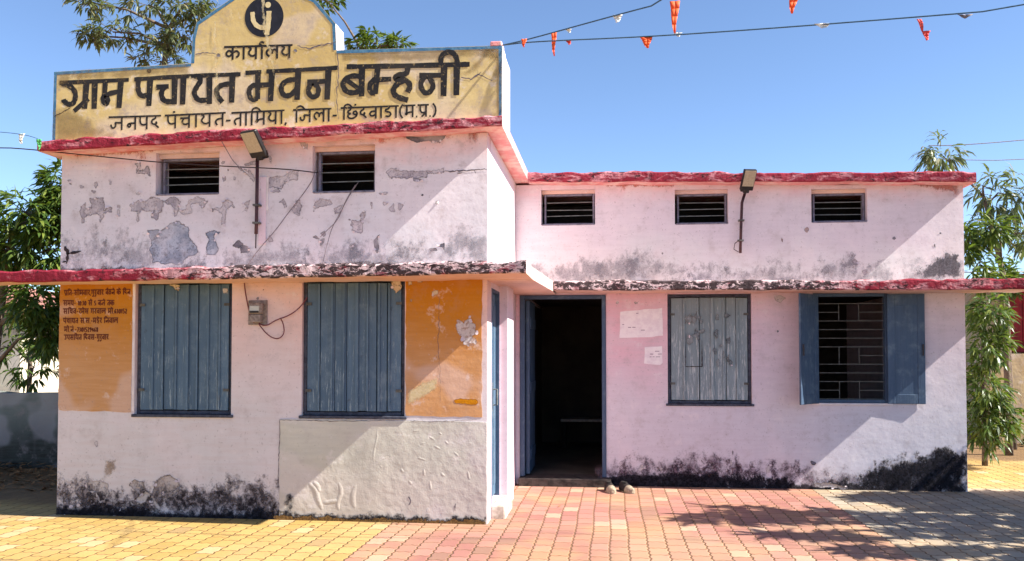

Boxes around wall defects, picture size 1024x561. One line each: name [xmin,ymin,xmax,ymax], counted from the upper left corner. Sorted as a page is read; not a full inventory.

peeling [386,168,444,196]
peeling [67,180,252,265]
peeling [268,171,403,251]
damp [917,253,961,278]
peeling [456,316,478,346]
damp [606,447,968,492]
damp [56,475,486,525]